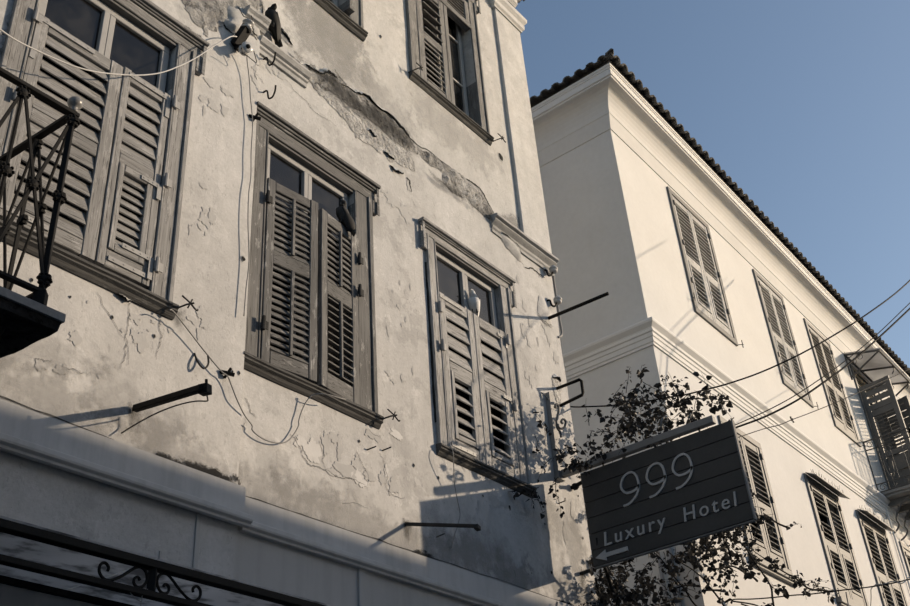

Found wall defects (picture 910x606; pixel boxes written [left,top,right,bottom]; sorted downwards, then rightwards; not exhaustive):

flaking render [182,0,265,37]
flaking render [281,28,494,224]
crack [97,292,131,364]